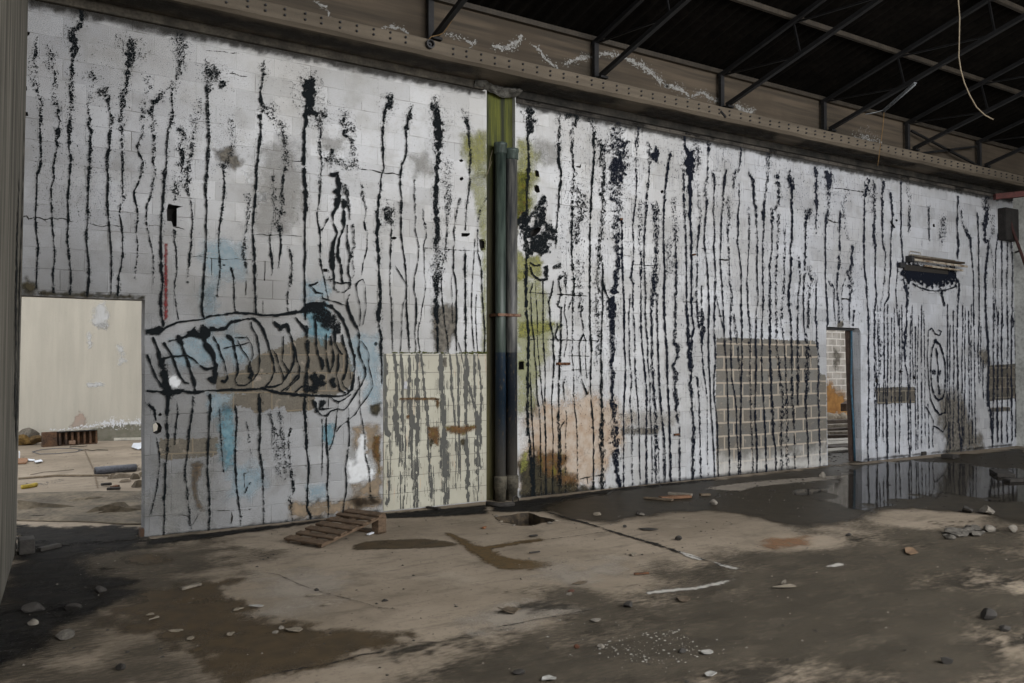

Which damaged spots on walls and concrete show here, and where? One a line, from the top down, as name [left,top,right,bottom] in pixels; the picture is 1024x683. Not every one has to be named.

damp [490,34,718,102]
damp [217,147,240,169]
spalling [167,205,181,227]
damp [304,303,332,341]
damp [432,304,458,352]
damp [91,424,141,441]
damp [191,461,203,510]
damp [218,408,235,466]
peeling [347,425,383,509]
rust [427,425,476,446]
rust [518,395,623,487]
damp [517,392,1024,528]